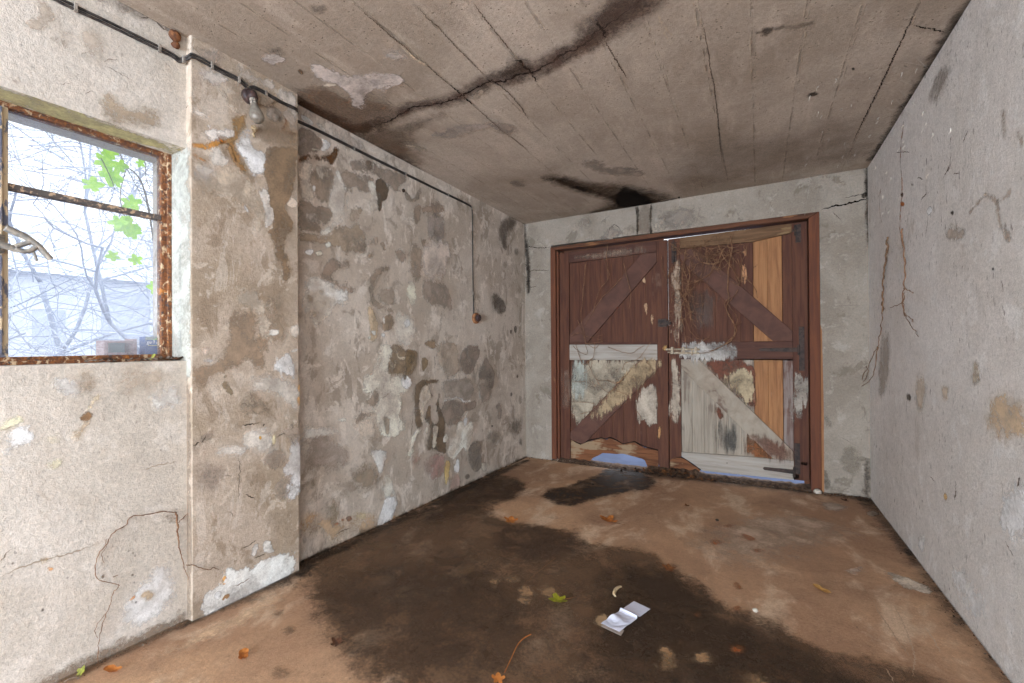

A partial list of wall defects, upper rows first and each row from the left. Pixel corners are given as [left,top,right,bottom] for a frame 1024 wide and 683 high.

rust [192,115,246,172]
peeling [240,68,362,151]
water stain [297,64,426,163]
crack [354,0,659,148]
crack [853,3,944,142]
water stain [549,161,693,234]
crack [824,194,866,221]
peeling [1,416,34,449]
peeling [408,385,473,473]
water stain [699,517,840,555]
peeling [201,541,296,617]
water stain [489,576,560,604]